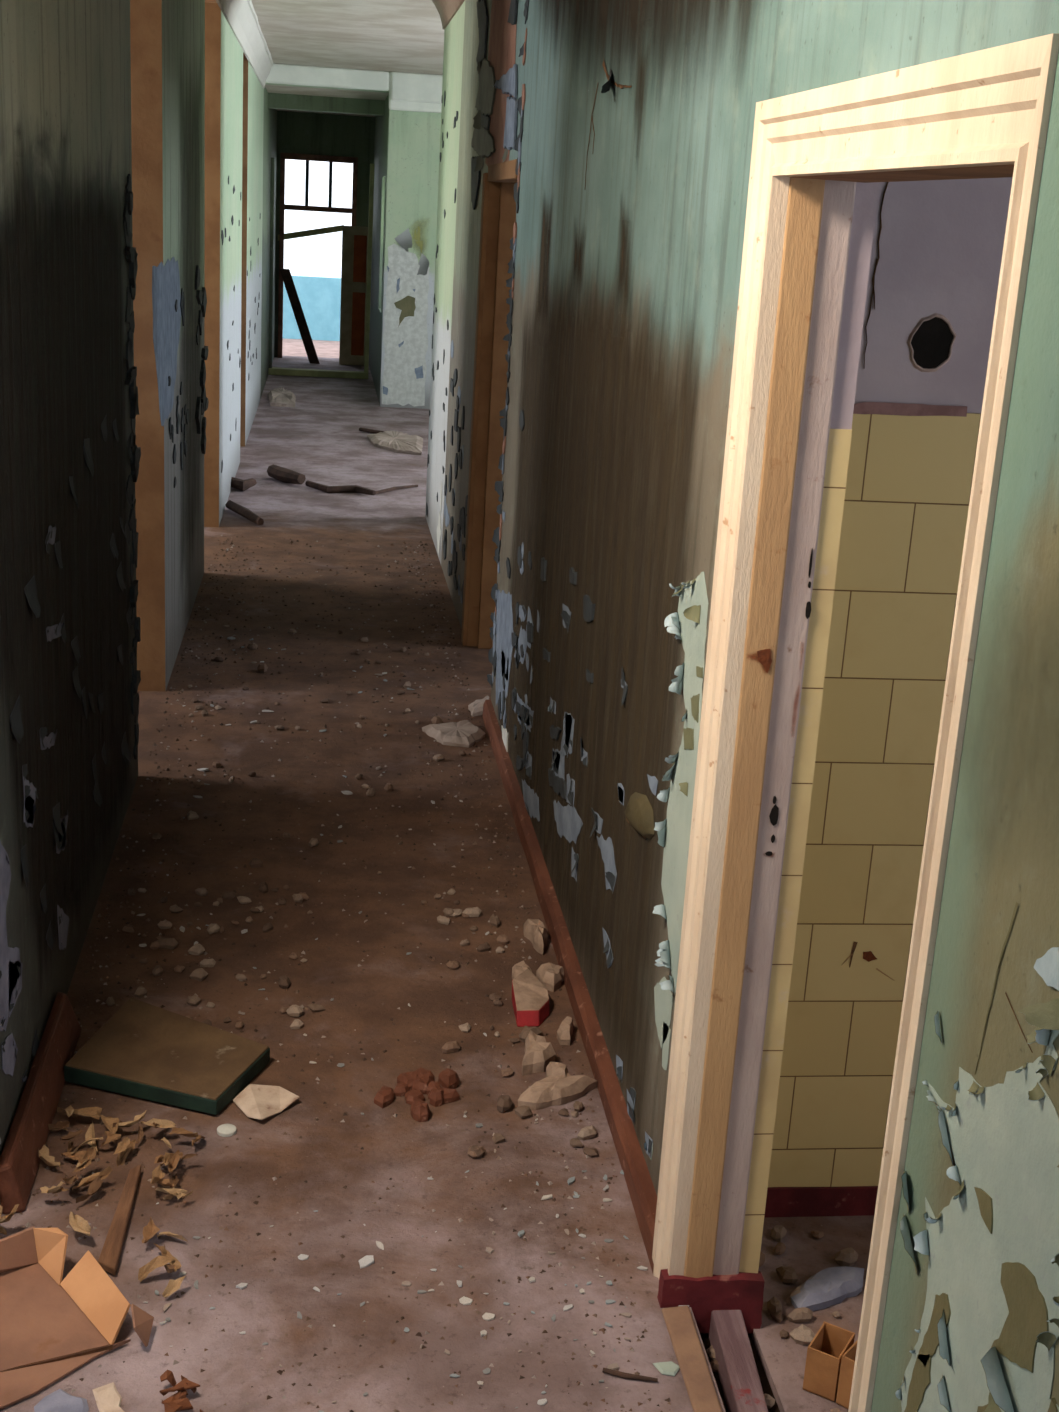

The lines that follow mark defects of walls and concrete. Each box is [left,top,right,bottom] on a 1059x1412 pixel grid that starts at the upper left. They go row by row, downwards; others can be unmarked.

peeling [84,174,209,807]
peeling [221,176,261,245]
peeling [227,293,260,391]
spalling [382,228,468,604]
peeling [440,0,617,893]
crack [864,182,889,369]
hole [907,313,957,372]
peeling [22,764,38,828]
peeling [647,572,709,1070]
peeling [0,841,69,1084]
peeling [616,1055,653,1160]
peeling [895,947,1059,1412]